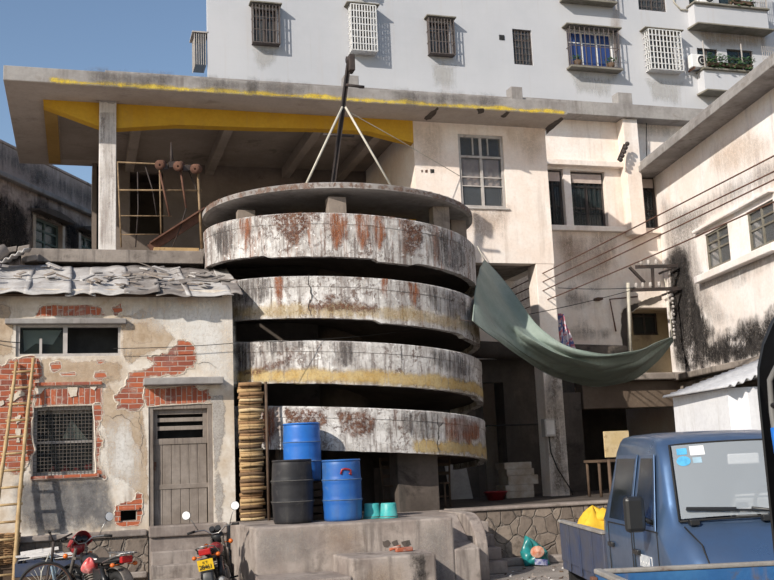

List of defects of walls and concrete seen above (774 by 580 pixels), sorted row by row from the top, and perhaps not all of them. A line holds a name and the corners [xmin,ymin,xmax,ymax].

corrosion [330,213,346,248]
corrosion [356,215,386,248]
corrosion [400,221,422,255]
leakage [668,248,773,371]
spalling [0,303,212,528]
corrosion [263,410,275,442]
leakage [21,480,112,530]